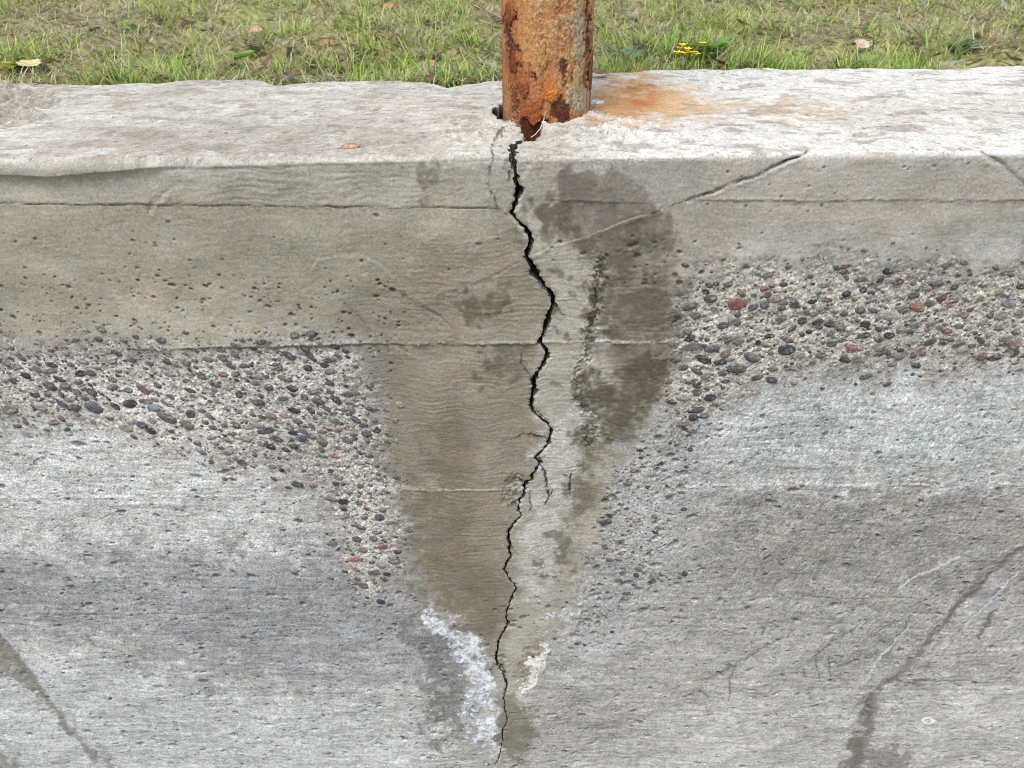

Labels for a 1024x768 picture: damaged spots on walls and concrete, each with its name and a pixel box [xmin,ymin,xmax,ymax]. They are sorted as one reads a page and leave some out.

rust [590,70,699,121]
crack [487,125,572,763]
leakage [397,169,683,765]